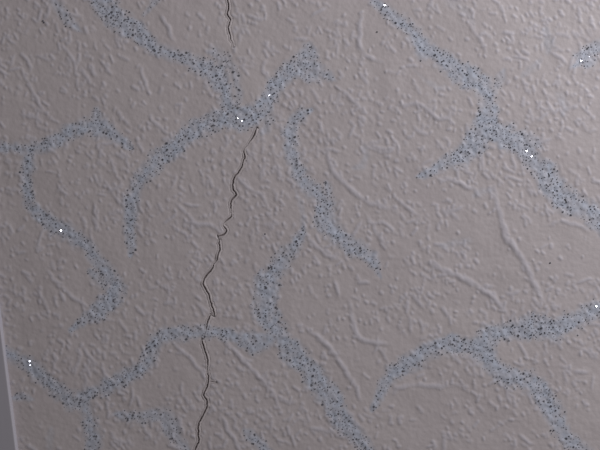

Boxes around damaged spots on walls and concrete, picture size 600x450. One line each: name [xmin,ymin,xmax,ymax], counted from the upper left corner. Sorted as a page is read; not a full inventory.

crack [224,0,235,48]
crack [192,128,259,450]